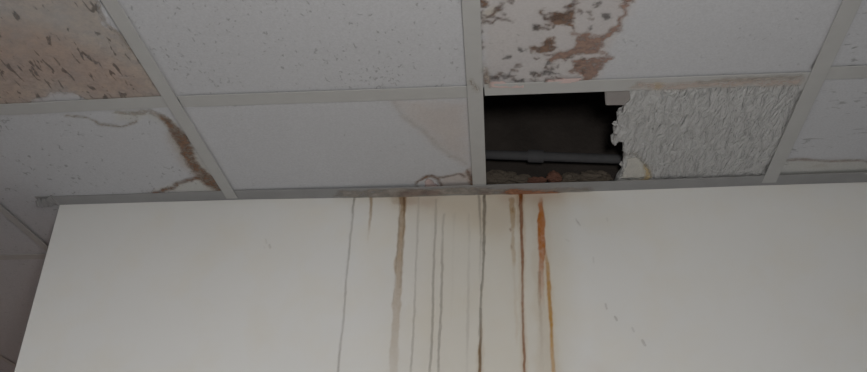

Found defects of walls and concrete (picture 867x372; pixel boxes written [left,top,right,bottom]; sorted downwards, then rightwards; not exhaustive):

leakage [0,0,161,104]
peeling [484,0,632,88]
leakage [115,110,221,193]